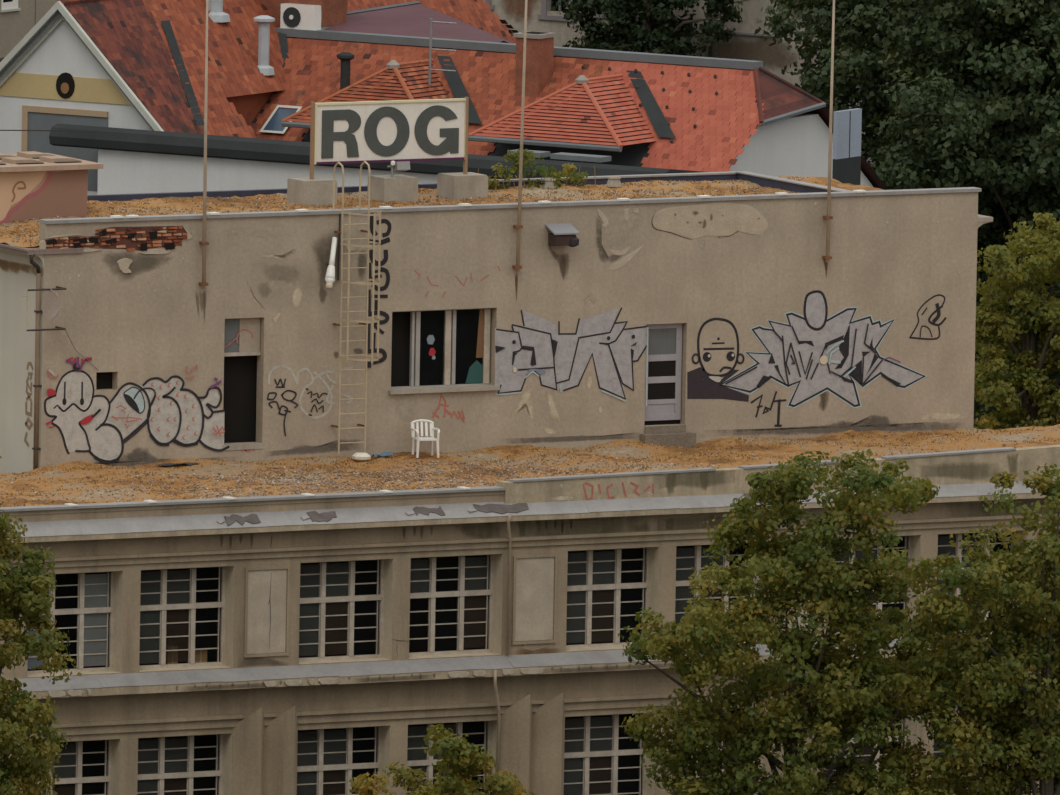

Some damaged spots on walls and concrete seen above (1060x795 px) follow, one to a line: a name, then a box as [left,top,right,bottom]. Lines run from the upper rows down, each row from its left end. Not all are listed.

flaking render [39,226,192,254]